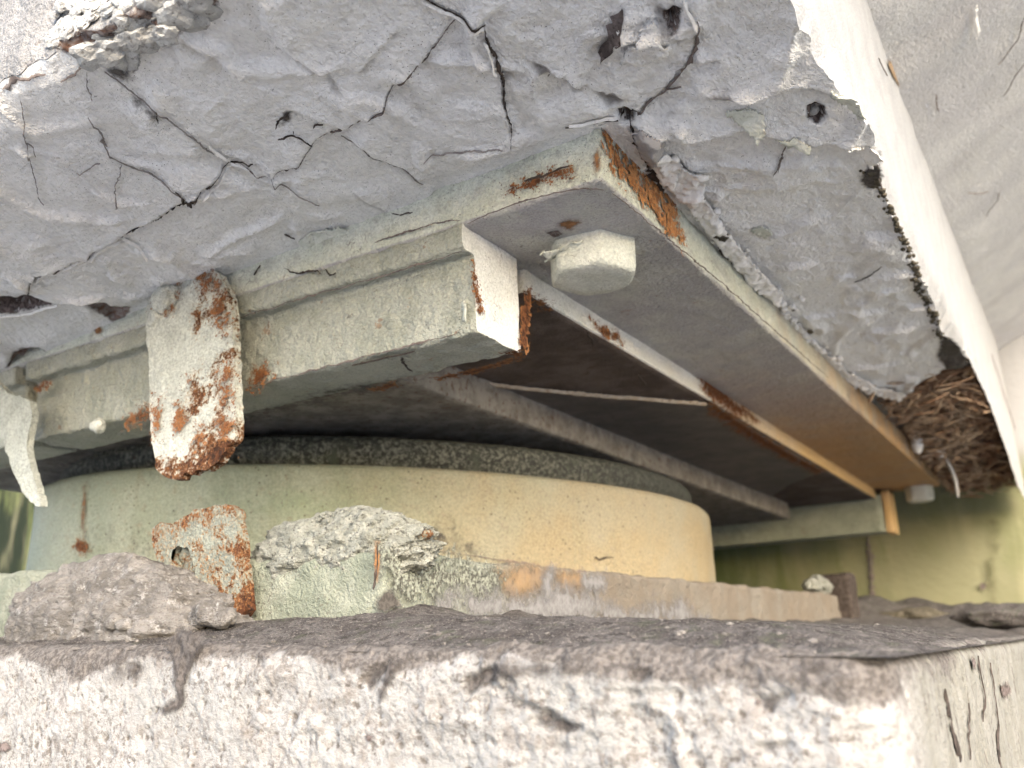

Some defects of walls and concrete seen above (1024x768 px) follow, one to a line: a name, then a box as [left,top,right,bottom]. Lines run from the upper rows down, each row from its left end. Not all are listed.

spalling [43,0,223,73]
crack [565,0,700,129]
crack [2,0,512,296]
corrosion [500,160,575,199]
corrosion [594,128,687,256]
peeling [725,108,812,156]
peeling [848,146,884,170]
spalling [653,153,905,402]
corrosion [121,268,279,460]
corrosion [429,286,561,381]
corrosion [179,548,194,572]